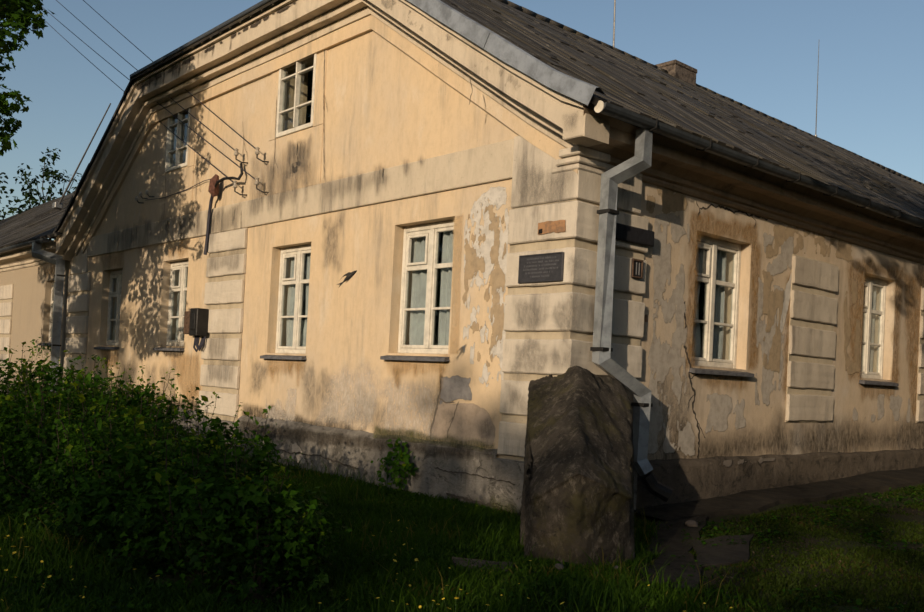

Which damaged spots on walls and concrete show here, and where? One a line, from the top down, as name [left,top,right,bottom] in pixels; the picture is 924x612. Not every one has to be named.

peeling [462,186,509,387]
crack [683,302,705,457]
peeling [644,186,852,456]
leakage [651,424,924,460]
peeling [844,279,861,375]